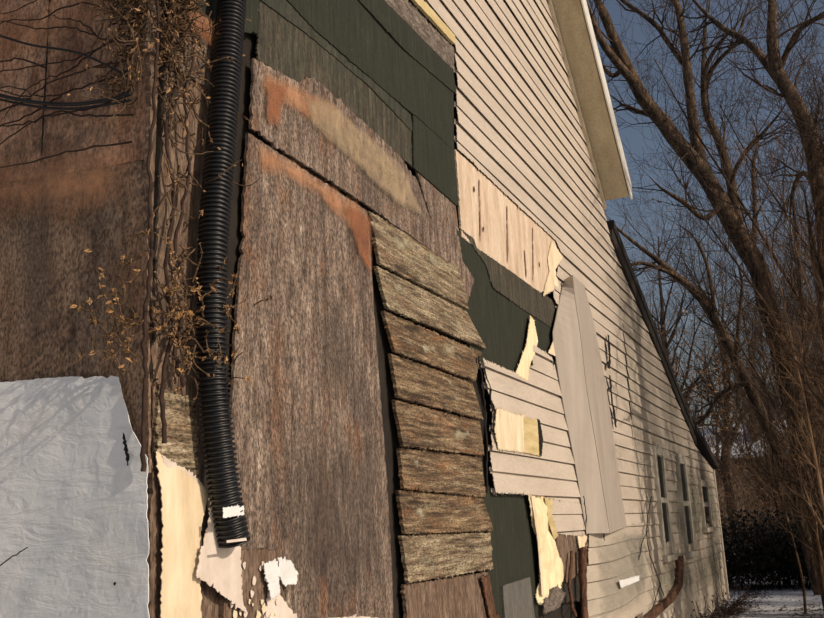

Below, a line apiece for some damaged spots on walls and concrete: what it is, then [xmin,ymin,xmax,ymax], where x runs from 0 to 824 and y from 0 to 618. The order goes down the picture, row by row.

peeling [454,149,563,296]
peeling [494,407,543,457]
peeling [229,556,298,618]